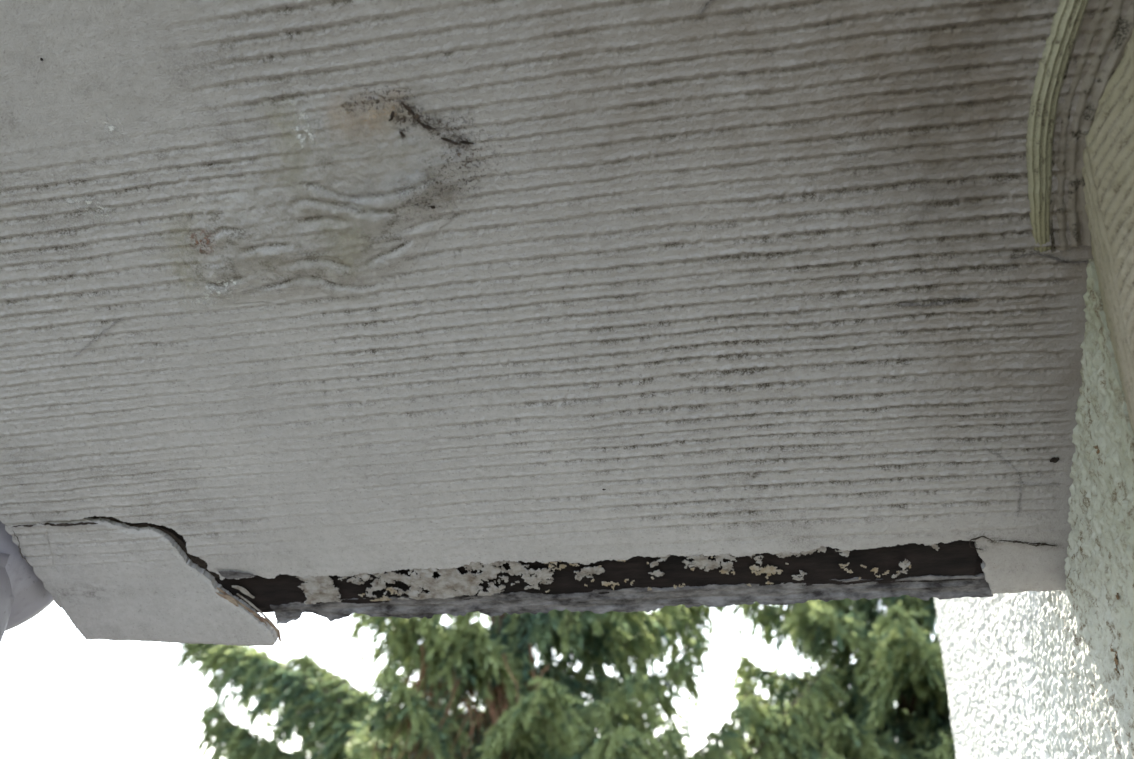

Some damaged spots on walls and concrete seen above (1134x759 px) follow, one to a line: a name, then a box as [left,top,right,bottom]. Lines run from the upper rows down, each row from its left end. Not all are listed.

crack [13,516,220,578]
spalling [46,517,977,646]